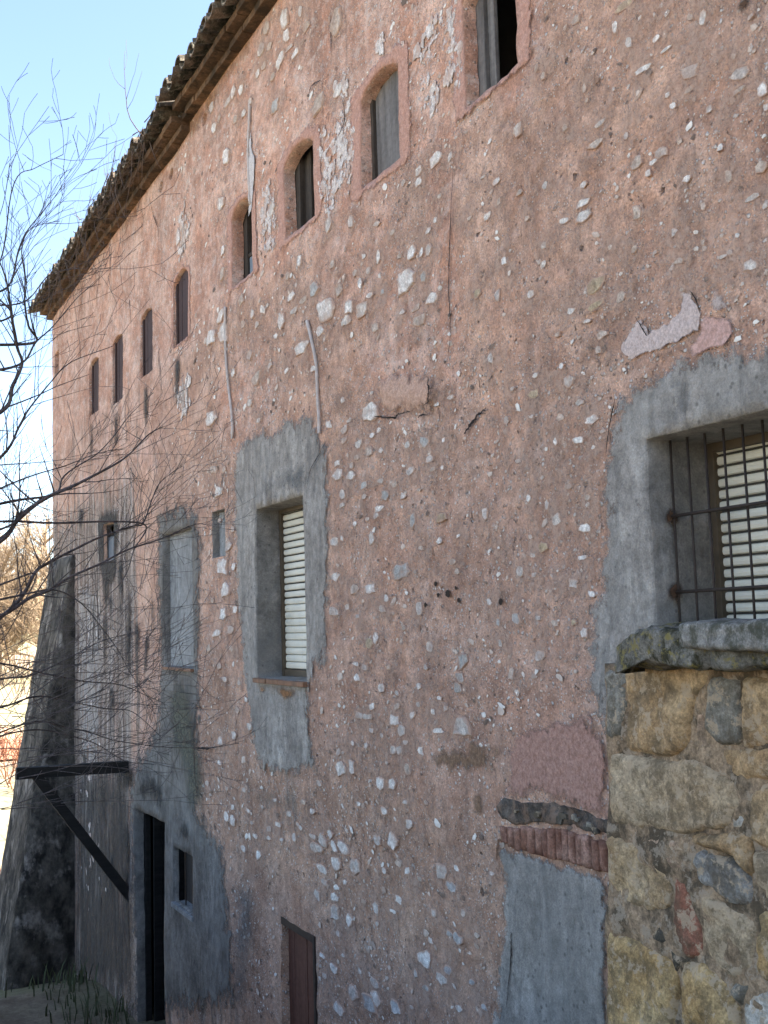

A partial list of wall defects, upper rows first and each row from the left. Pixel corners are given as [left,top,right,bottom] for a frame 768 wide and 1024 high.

spalling [456,0,768,266]
crack [446,167,454,361]
spalling [543,143,768,359]
crack [374,378,440,422]
crack [464,382,486,434]